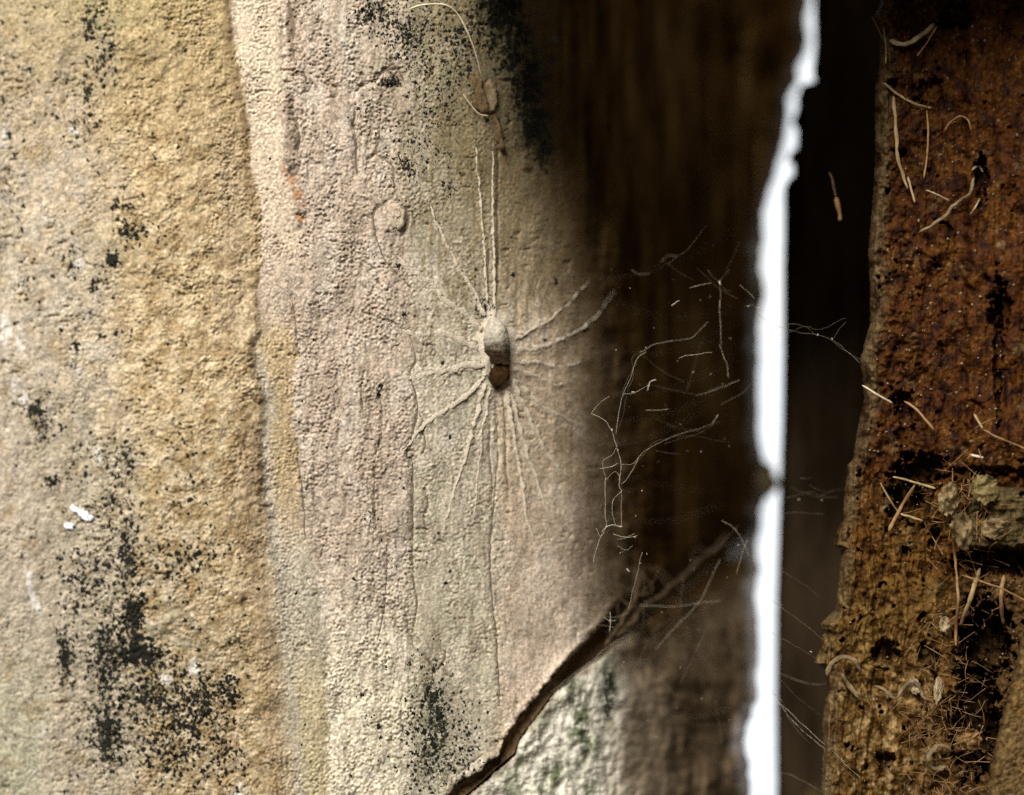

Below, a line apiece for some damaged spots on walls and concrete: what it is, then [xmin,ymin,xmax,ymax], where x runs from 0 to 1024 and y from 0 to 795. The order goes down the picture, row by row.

water stain [343,0,562,212]
water stain [25,418,253,795]
water stain [356,639,498,795]
crack [449,391,577,795]
crack [611,592,639,641]